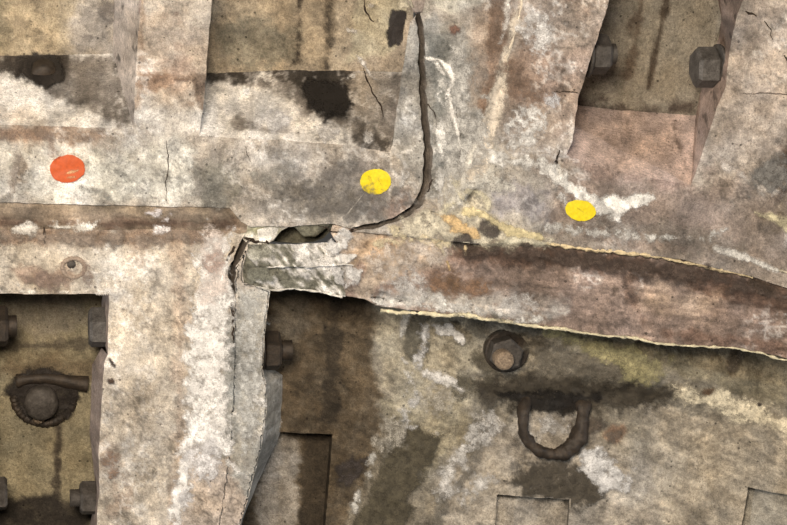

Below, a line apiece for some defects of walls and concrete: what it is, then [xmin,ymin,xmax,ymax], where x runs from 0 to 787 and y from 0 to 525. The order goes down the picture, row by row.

crack [318,14,437,233]
crack [225,235,269,344]
spalling [243,224,363,298]